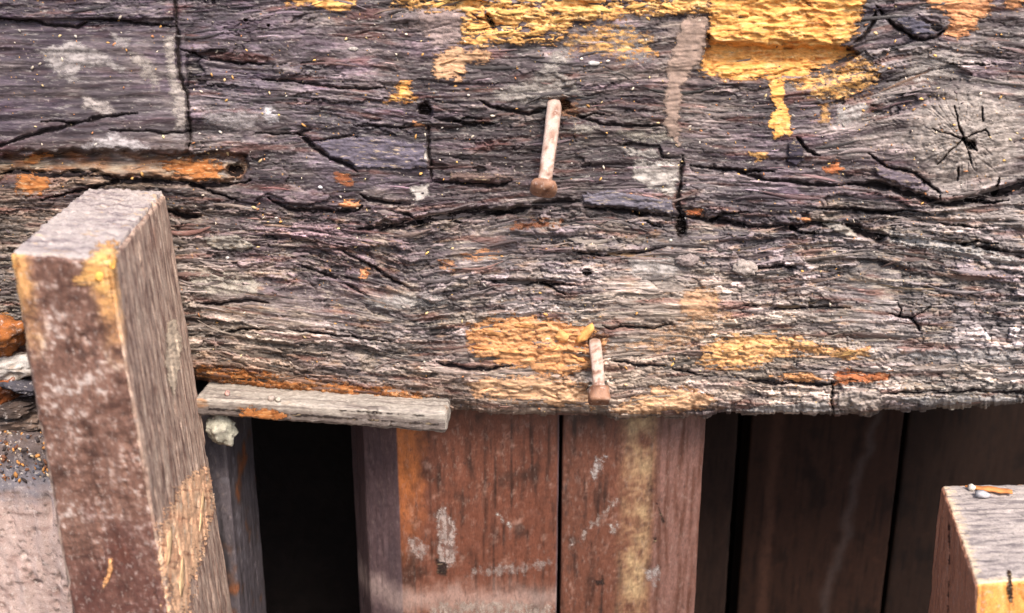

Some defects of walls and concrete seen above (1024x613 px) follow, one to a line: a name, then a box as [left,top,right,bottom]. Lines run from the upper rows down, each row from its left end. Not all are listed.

peeling [466,24,511,34]
peeling [549,4,612,24]
crack [0,1,380,149]
rust [14,152,55,196]
rust [149,155,225,183]
crack [1,101,1024,258]
crack [890,304,928,334]
rust [580,329,610,354]
rust [195,364,427,399]
rust [239,405,291,420]